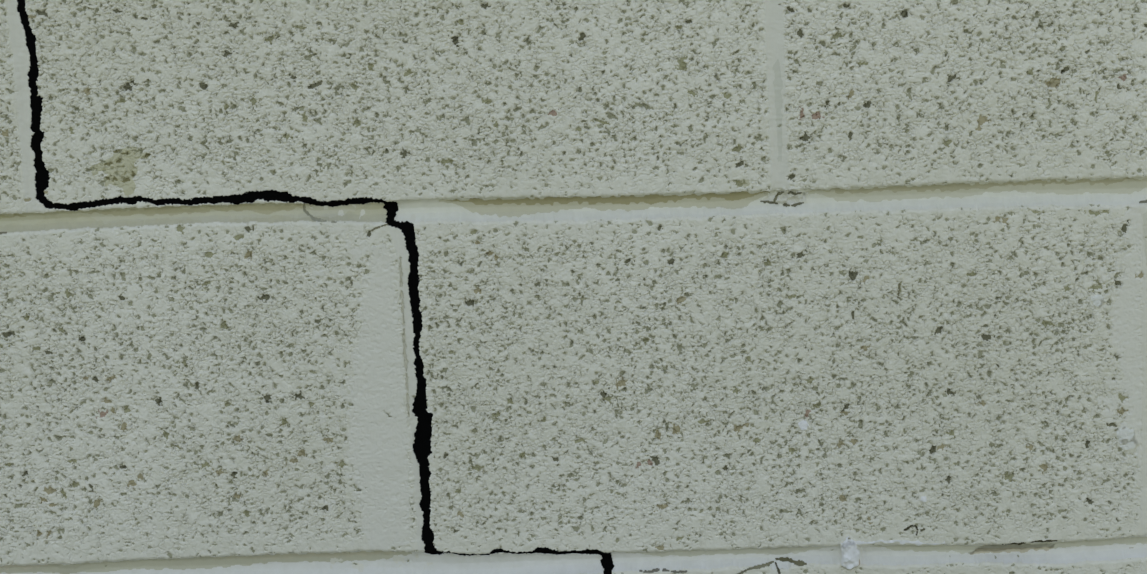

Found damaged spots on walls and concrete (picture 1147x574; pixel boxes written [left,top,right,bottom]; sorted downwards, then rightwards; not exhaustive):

crack [17,0,687,574]
crack [737,557,807,574]